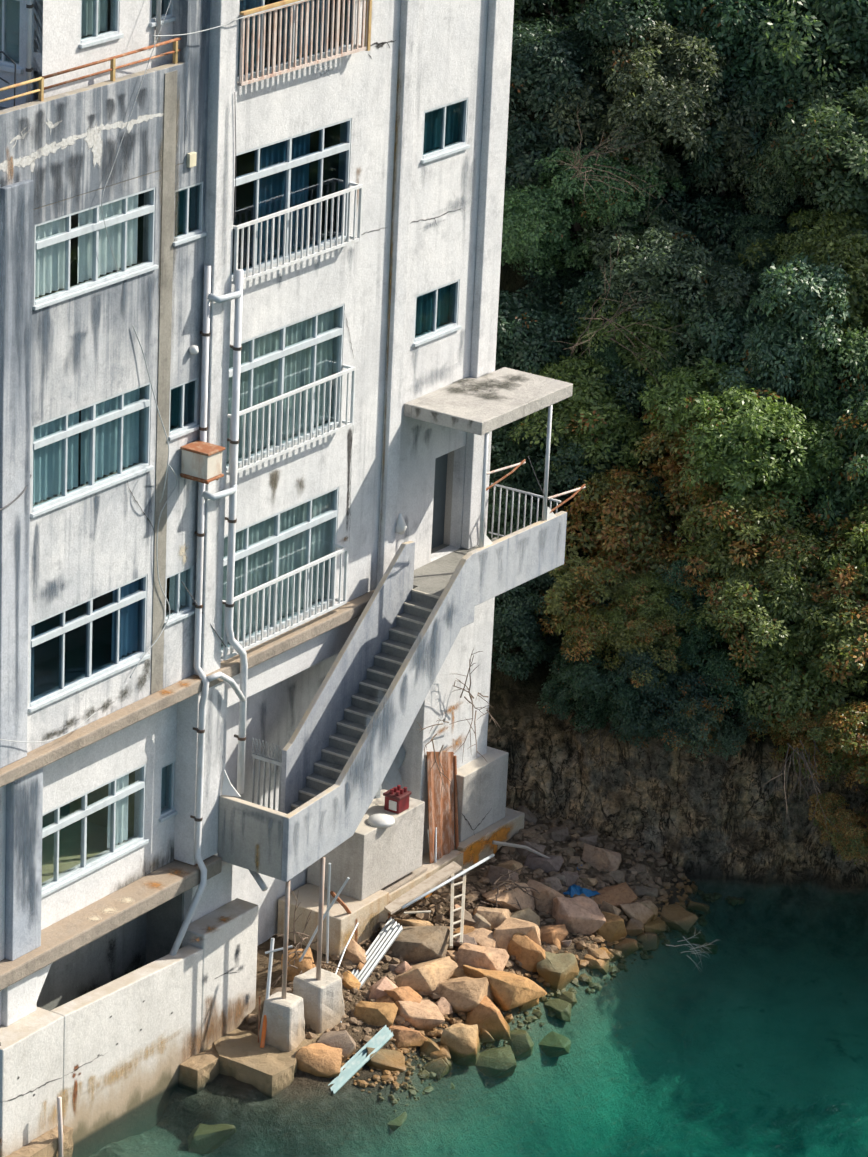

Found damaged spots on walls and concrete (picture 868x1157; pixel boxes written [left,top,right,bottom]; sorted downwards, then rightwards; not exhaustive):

water stain [20,110,44,143]
water stain [103,47,199,224]
water stain [0,155,83,422]
water stain [74,296,101,361]
water stain [16,446,29,671]
water stain [46,581,64,598]
water stain [14,779,38,913]
corrosion [427,751,510,864]
crack [1,1053,106,1103]
corrosion [188,999,249,1056]